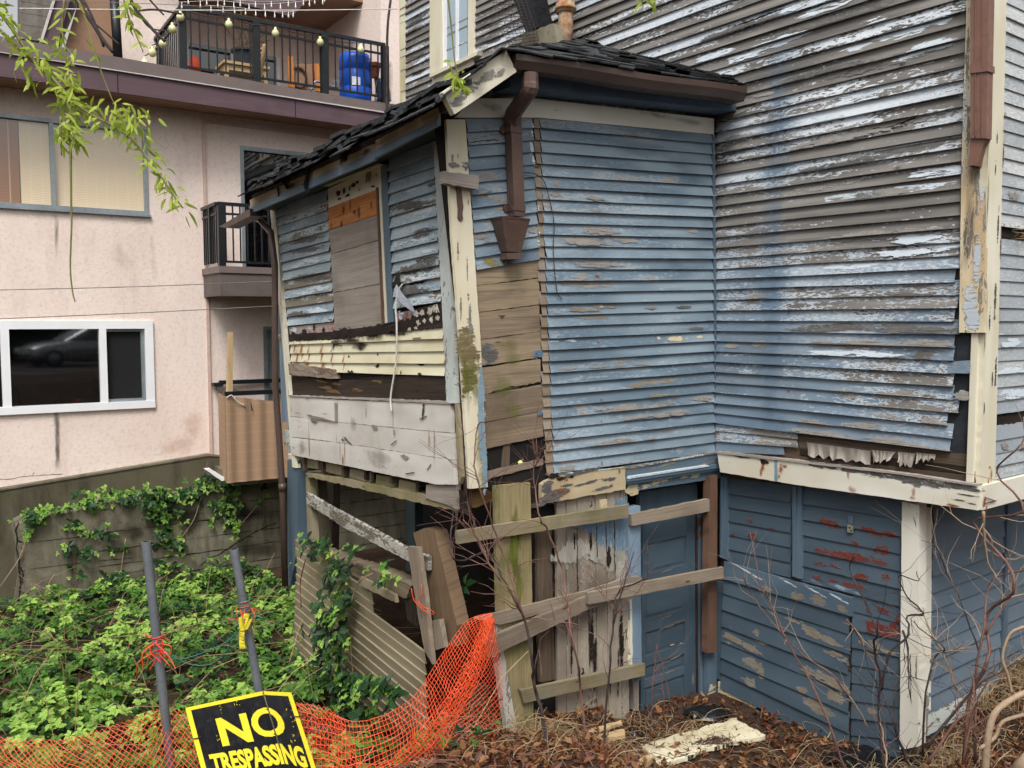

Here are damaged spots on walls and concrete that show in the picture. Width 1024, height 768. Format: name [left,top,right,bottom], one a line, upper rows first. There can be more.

peeling [693,0,895,65]
peeling [716,8,965,123]
peeling [787,79,968,202]
peeling [391,227,440,331]
peeling [545,260,624,288]
peeling [785,227,997,364]
peeling [992,338,1024,400]
peeling [588,378,712,447]
peeling [788,412,949,451]
peeling [538,452,715,580]
peeling [722,629,768,688]
peeling [784,605,901,665]